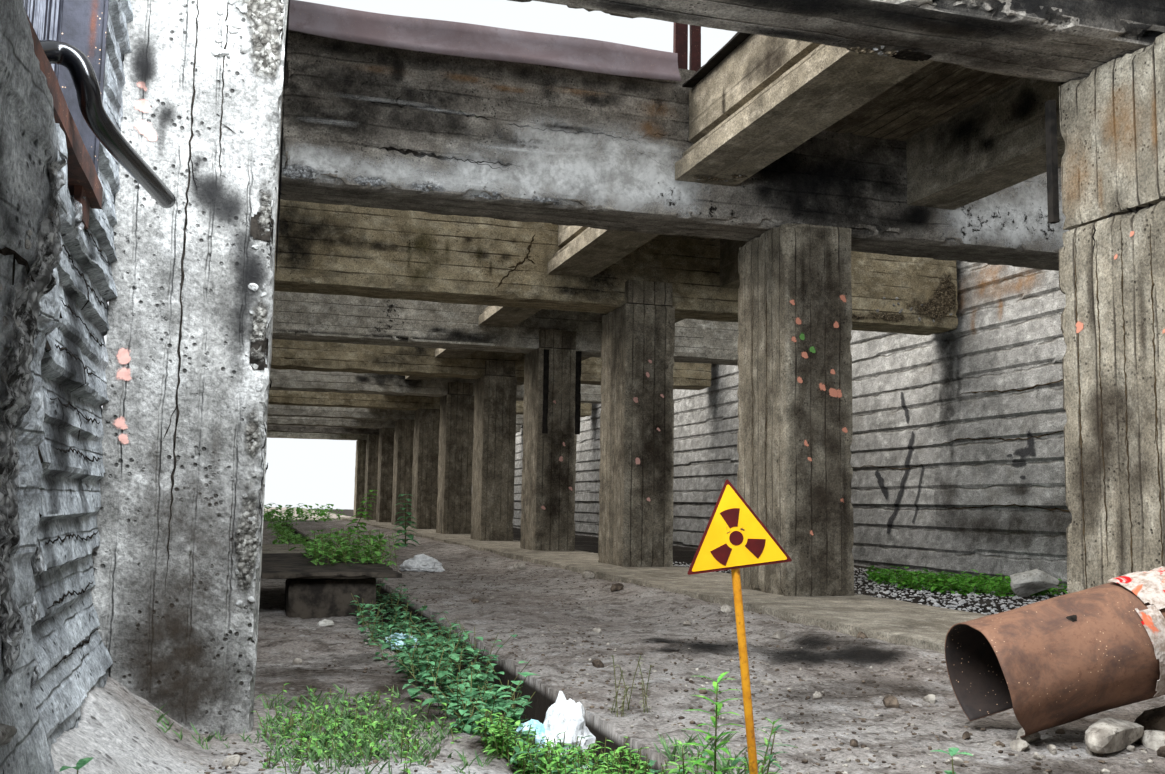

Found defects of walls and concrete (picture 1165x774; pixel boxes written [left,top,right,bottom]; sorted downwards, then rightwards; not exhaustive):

water stain [908,206,929,224]
crack [495,235,535,289]
crack [38,196,110,463]
water stain [796,262,850,568]
crack [852,196,1164,589]
crack [31,513,98,574]
crack [47,581,93,609]
crack [53,627,100,668]
water stain [126,576,234,718]